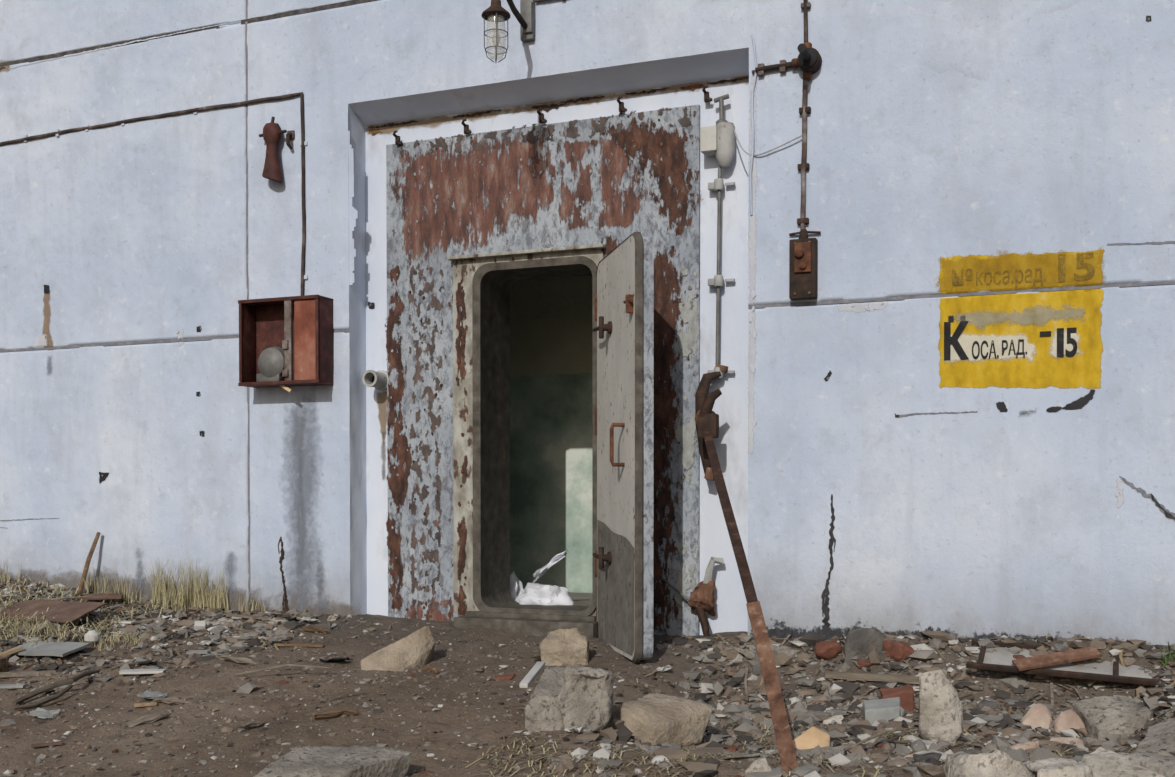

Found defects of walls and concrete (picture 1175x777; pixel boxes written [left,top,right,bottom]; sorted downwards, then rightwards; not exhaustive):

rust [34,284,53,373]
peeling [385,106,703,635]
peeling [597,520,634,656]
crack [821,494,836,632]
crack [1119,476,1175,521]